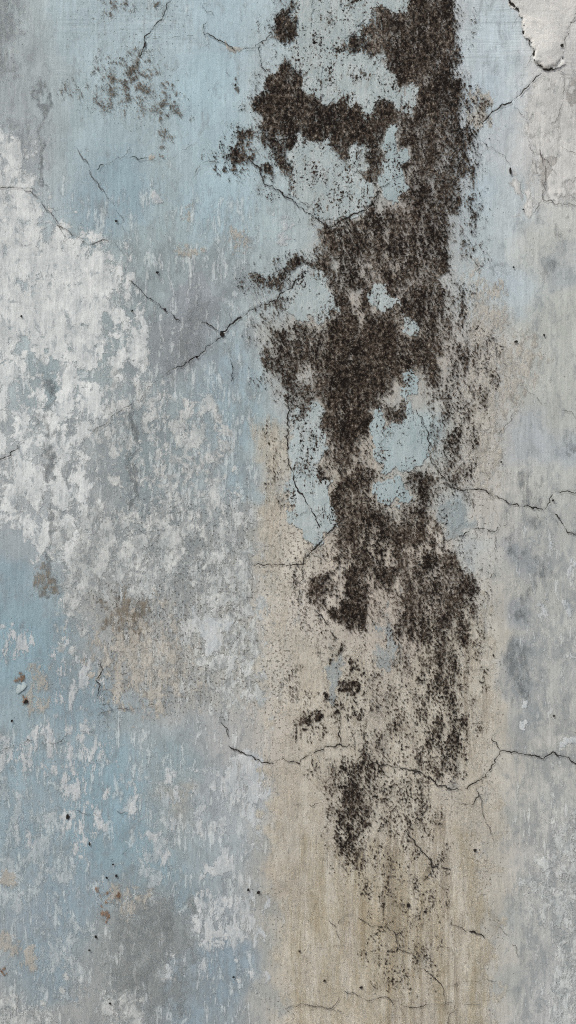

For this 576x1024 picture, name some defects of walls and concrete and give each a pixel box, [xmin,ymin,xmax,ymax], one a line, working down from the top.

crack [0,145,303,439]
leakage [201,0,507,1024]
crack [358,410,576,584]
crack [219,709,576,839]